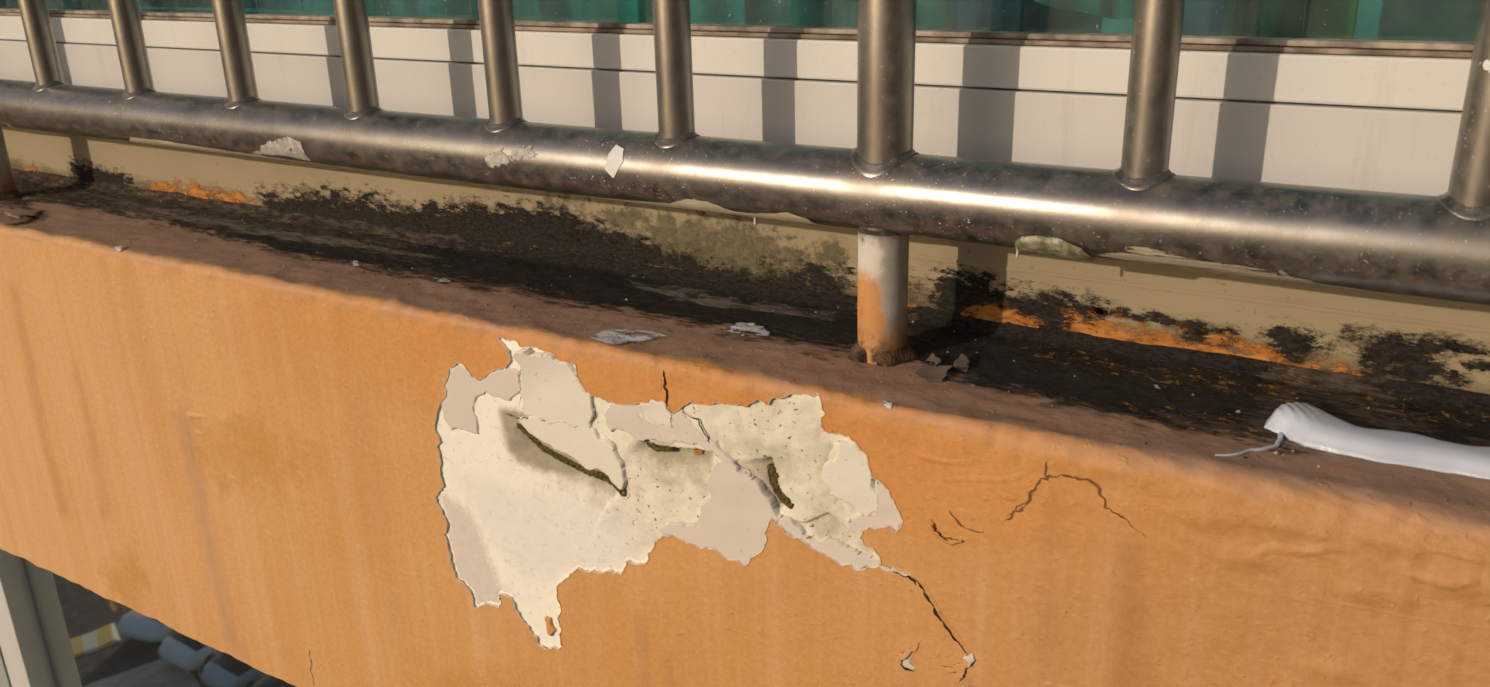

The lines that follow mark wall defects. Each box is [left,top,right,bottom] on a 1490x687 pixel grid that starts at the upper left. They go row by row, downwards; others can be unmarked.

leakage [0,156,858,359]
corrosion [961,301,1040,328]
leakage [907,264,1490,453]
corrosion [1017,309,1489,426]
peeling [434,336,904,650]
crack [1005,462,1143,534]
crack [878,564,975,682]